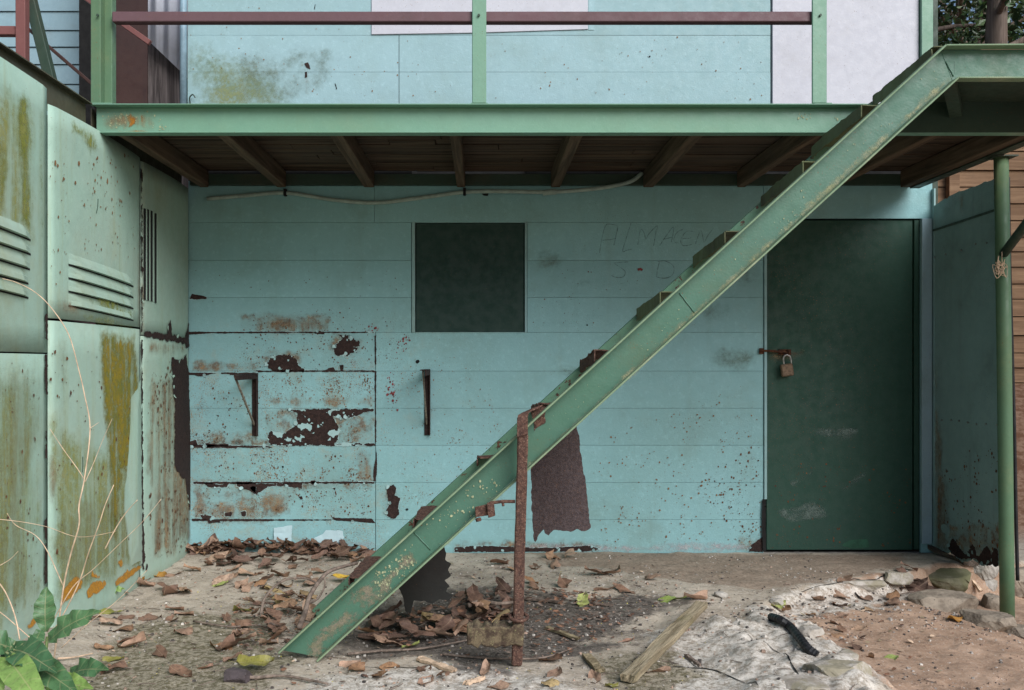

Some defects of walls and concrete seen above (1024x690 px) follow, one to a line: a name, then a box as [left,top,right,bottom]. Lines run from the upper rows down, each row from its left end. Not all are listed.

corrosion [454,394,808,553]